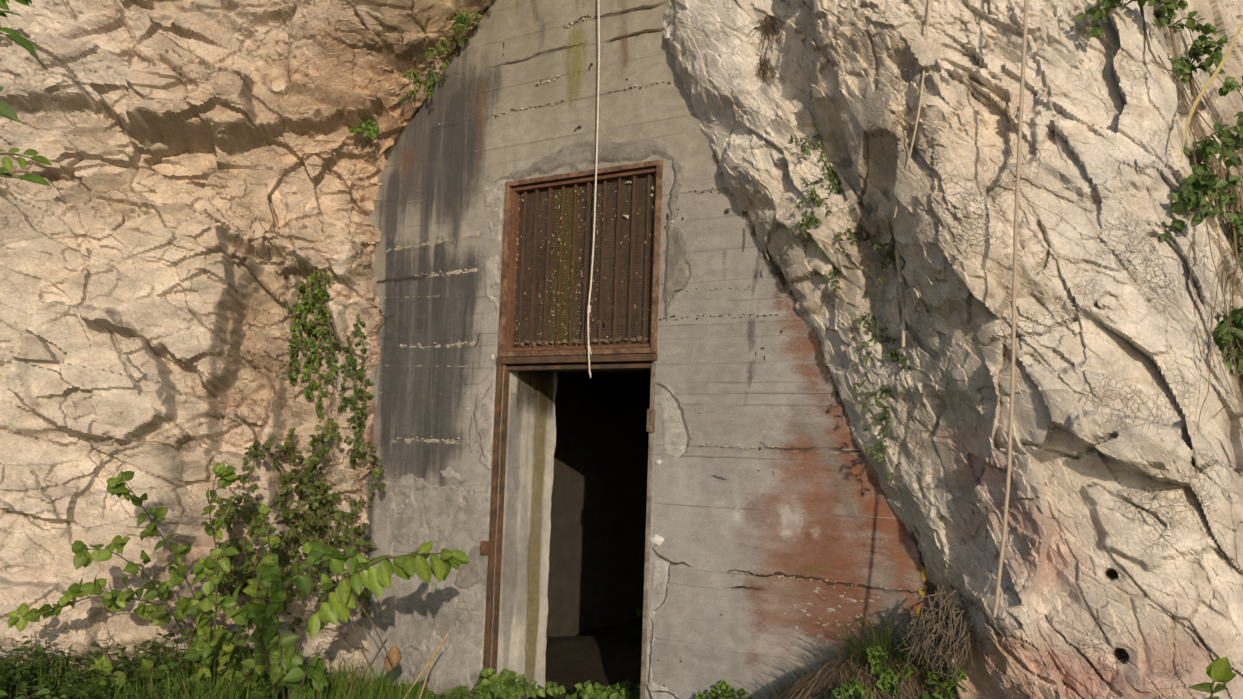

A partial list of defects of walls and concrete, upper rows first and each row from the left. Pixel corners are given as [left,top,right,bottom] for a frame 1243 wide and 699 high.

damp [371,55,499,485]
crack [645,548,689,699]
crack [728,569,929,593]
rust [770,289,926,622]